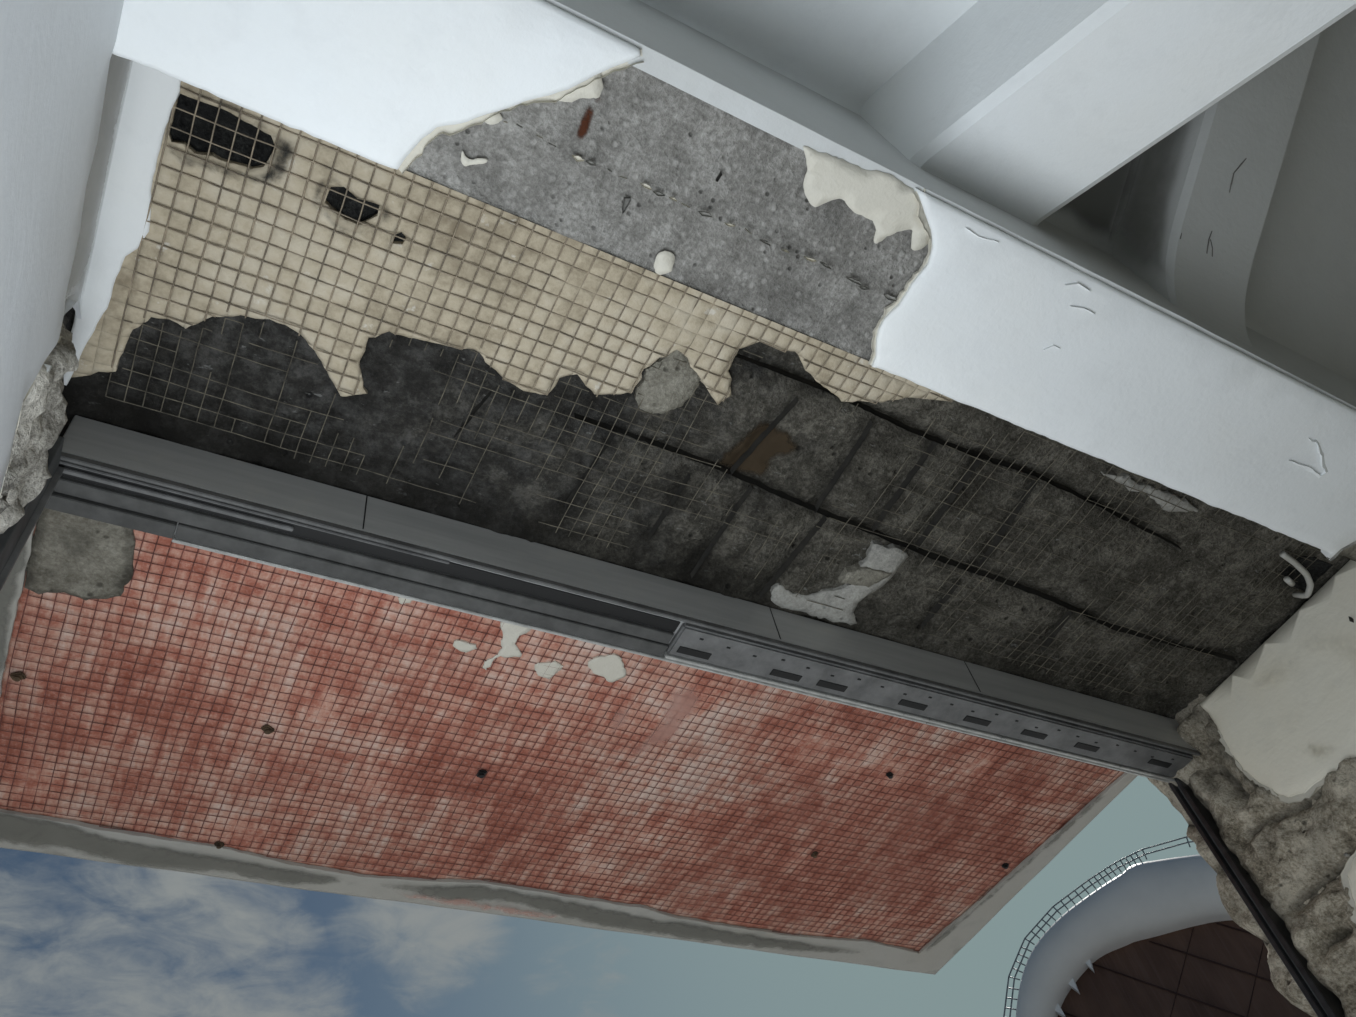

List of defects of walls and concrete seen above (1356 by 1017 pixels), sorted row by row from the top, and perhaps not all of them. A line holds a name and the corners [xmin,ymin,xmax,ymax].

spalling [170,93,291,181]
spalling [318,187,387,222]
spalling [398,48,932,369]
spalling [0,307,1356,1017]